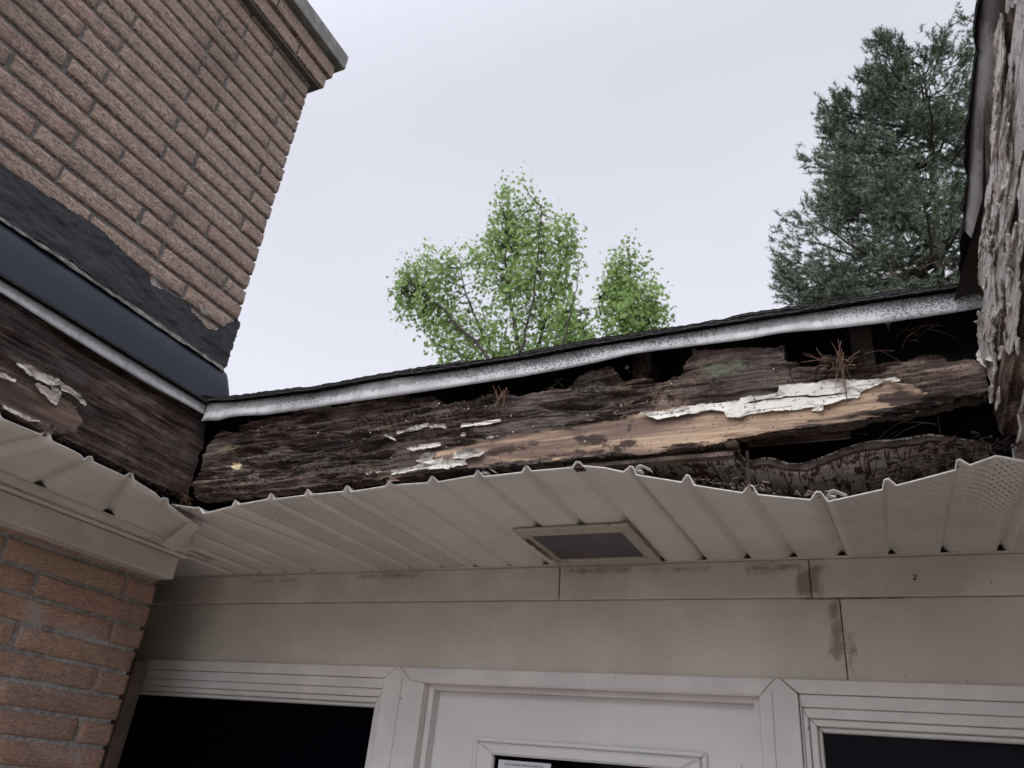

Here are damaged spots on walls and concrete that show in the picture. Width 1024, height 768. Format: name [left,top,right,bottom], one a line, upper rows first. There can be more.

peeling [973,0,1024,411]
peeling [0,362,87,434]
peeling [366,377,927,482]